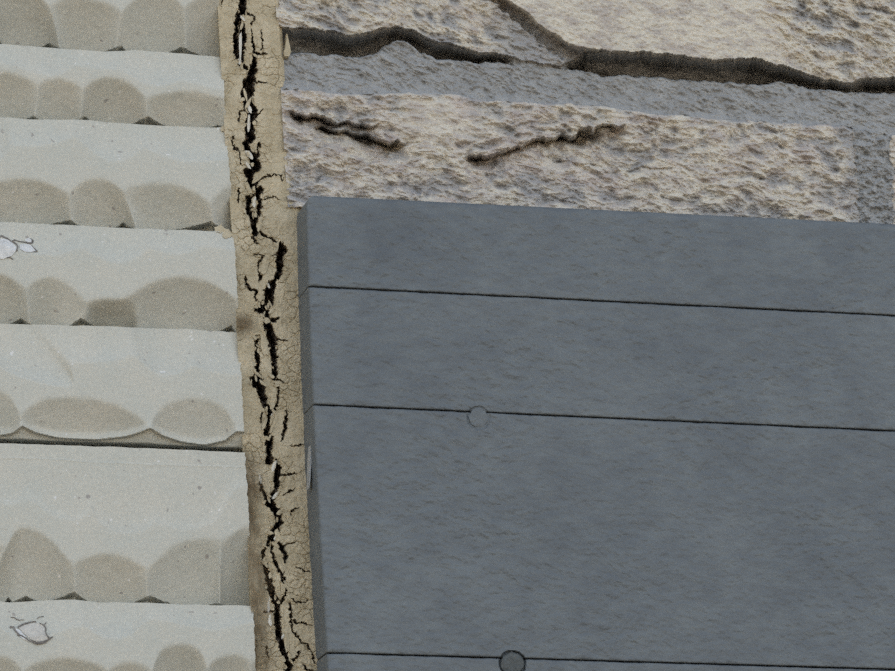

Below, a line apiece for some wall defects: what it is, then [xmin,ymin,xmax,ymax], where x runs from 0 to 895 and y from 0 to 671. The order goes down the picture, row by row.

peeling [0,235,38,259]
crack [221,0,315,671]
peeling [10,616,53,644]